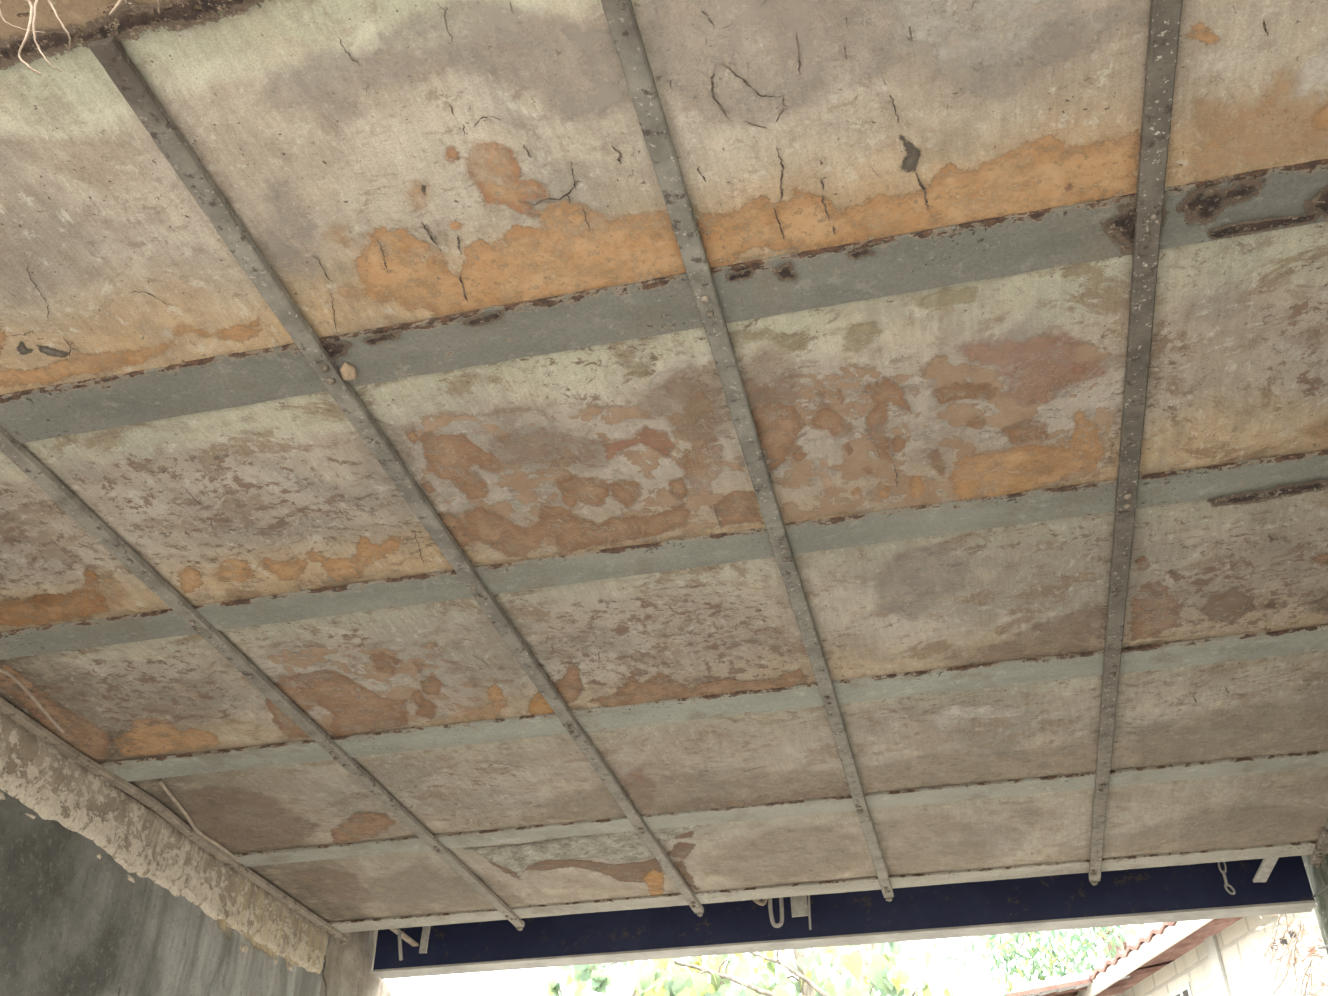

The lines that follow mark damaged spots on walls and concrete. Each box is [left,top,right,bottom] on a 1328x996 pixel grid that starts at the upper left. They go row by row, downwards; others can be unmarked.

corrosion [0,0,271,70]
crack [702,0,801,241]
spalling [900,135,920,173]
crack [820,160,835,235]
corrosion [697,130,1141,282]
crack [916,173,929,211]
corrosion [1161,177,1328,240]
spalling [17,342,69,358]
corrosion [1207,479,1328,507]
corrosion [1127,528,1328,642]